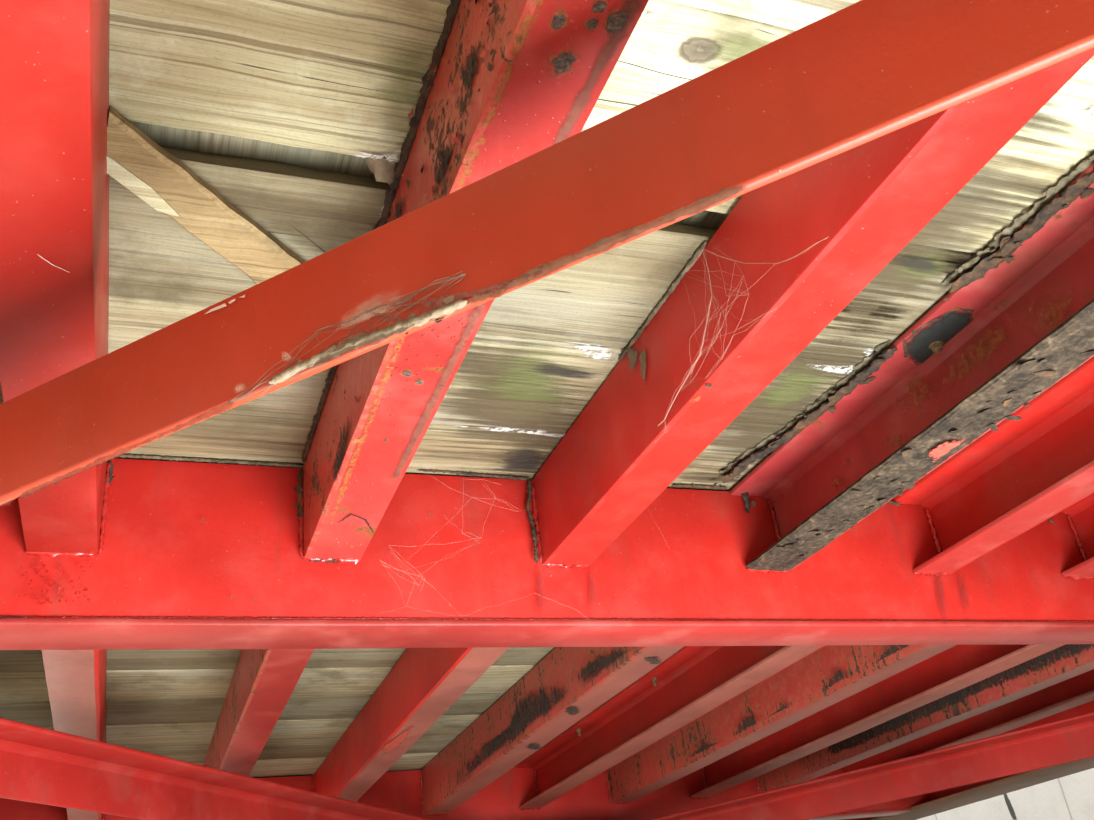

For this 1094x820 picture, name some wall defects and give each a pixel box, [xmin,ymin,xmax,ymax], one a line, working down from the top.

corrosion [371,0,461,229]
corrosion [552,0,641,144]
corrosion [944,166,1094,301]
corrosion [393,280,512,479]
peeling [326,422,349,481]
corrosion [456,649,625,785]
corrosion [734,703,792,736]
corrosion [825,644,1094,755]